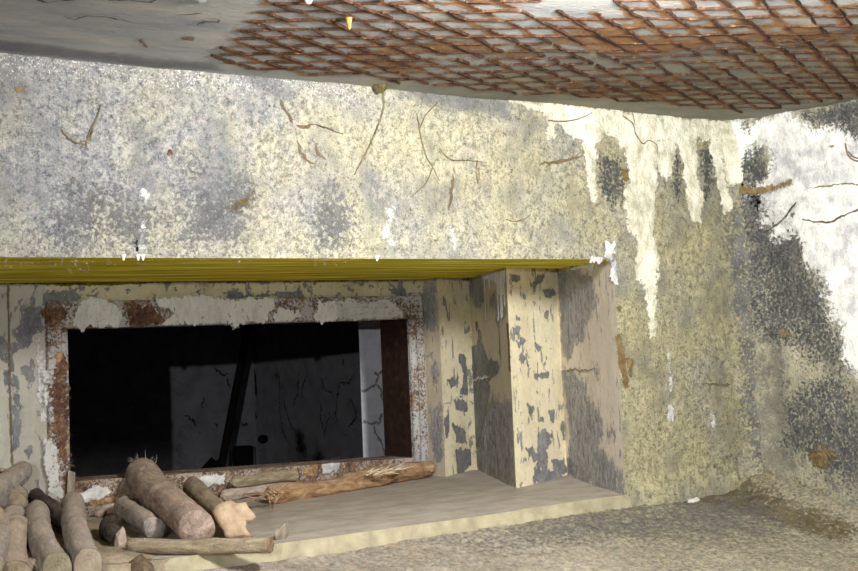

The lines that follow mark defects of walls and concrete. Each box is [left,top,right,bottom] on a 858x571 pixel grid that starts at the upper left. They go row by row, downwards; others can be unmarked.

crack [280,99,326,164]
crack [447,176,455,210]
crack [765,183,858,233]
rust [40,307,68,328]
peeling [469,275,549,379]
leakage [411,91,858,500]
peeling [0,306,44,460]
rust [49,351,73,493]
crack [279,359,385,454]
peeling [426,329,517,488]
peeling [520,267,624,494]